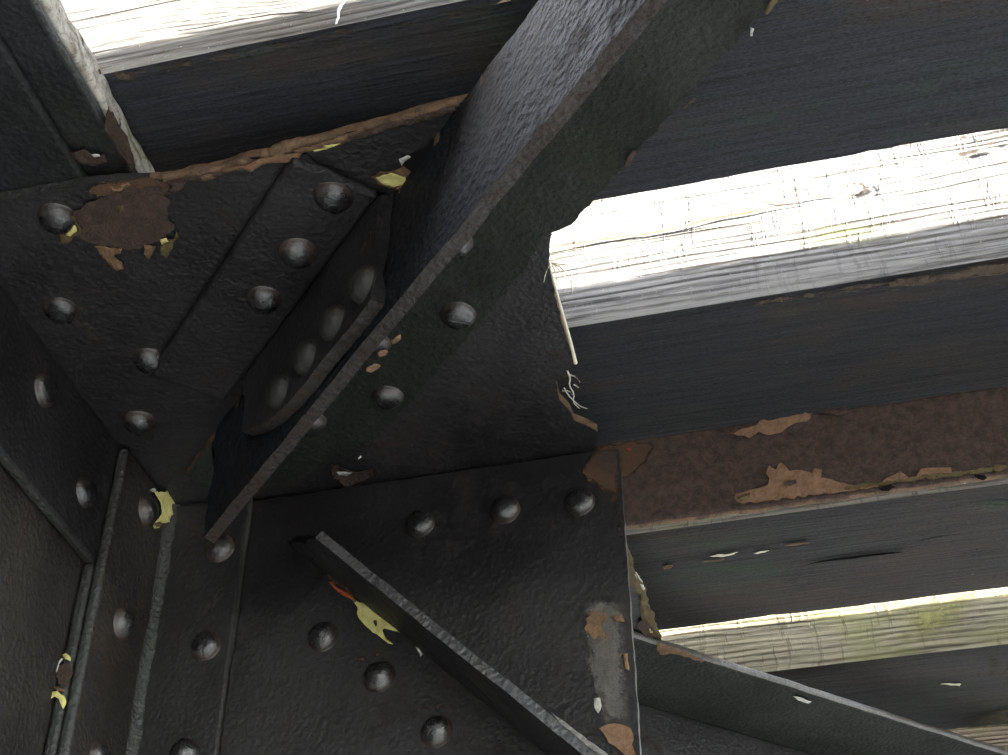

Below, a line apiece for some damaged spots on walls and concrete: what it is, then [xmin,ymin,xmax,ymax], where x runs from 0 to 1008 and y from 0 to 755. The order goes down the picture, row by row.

rust [60,96,460,271]
rust [731,406,848,438]
rust [734,462,952,504]
peeling [150,488,175,529]
peeling [328,574,399,644]